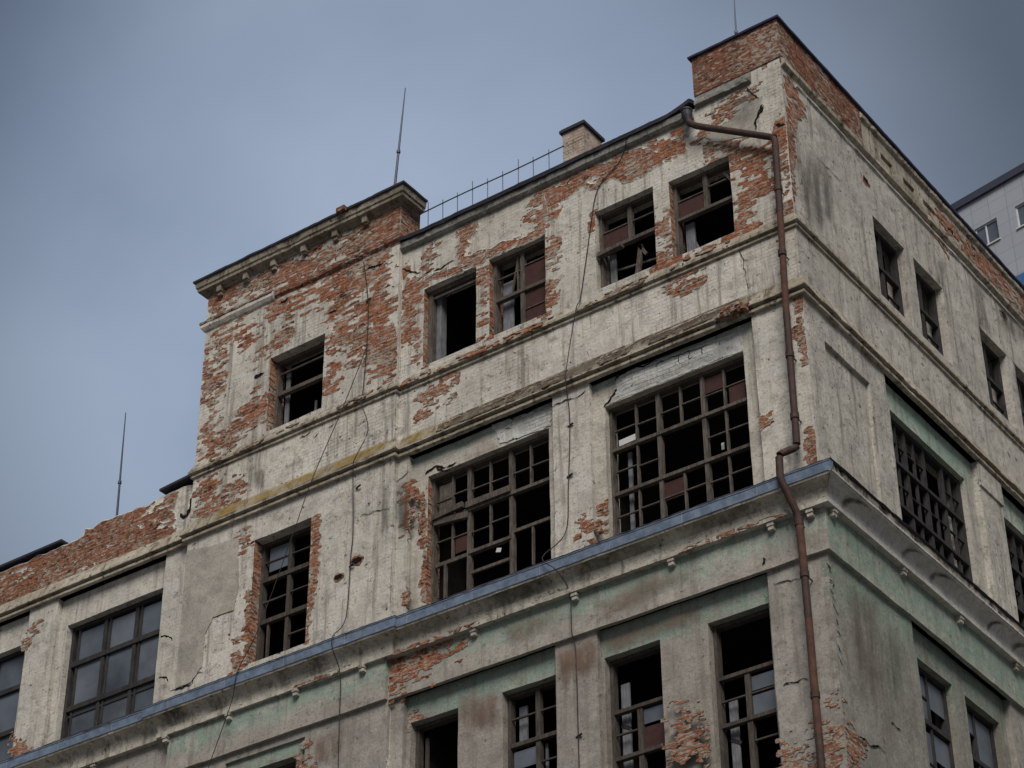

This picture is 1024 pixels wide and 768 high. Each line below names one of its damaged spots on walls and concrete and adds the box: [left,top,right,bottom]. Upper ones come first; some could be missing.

crack [747,88,785,128]
peeling [924,206,1024,320]
peeling [0,74,808,606]
flaking render [304,513,322,645]
crack [158,672,202,691]
flaking render [227,589,251,676]
peeling [388,620,480,732]
peeling [660,699,712,768]
peeling [775,687,868,768]